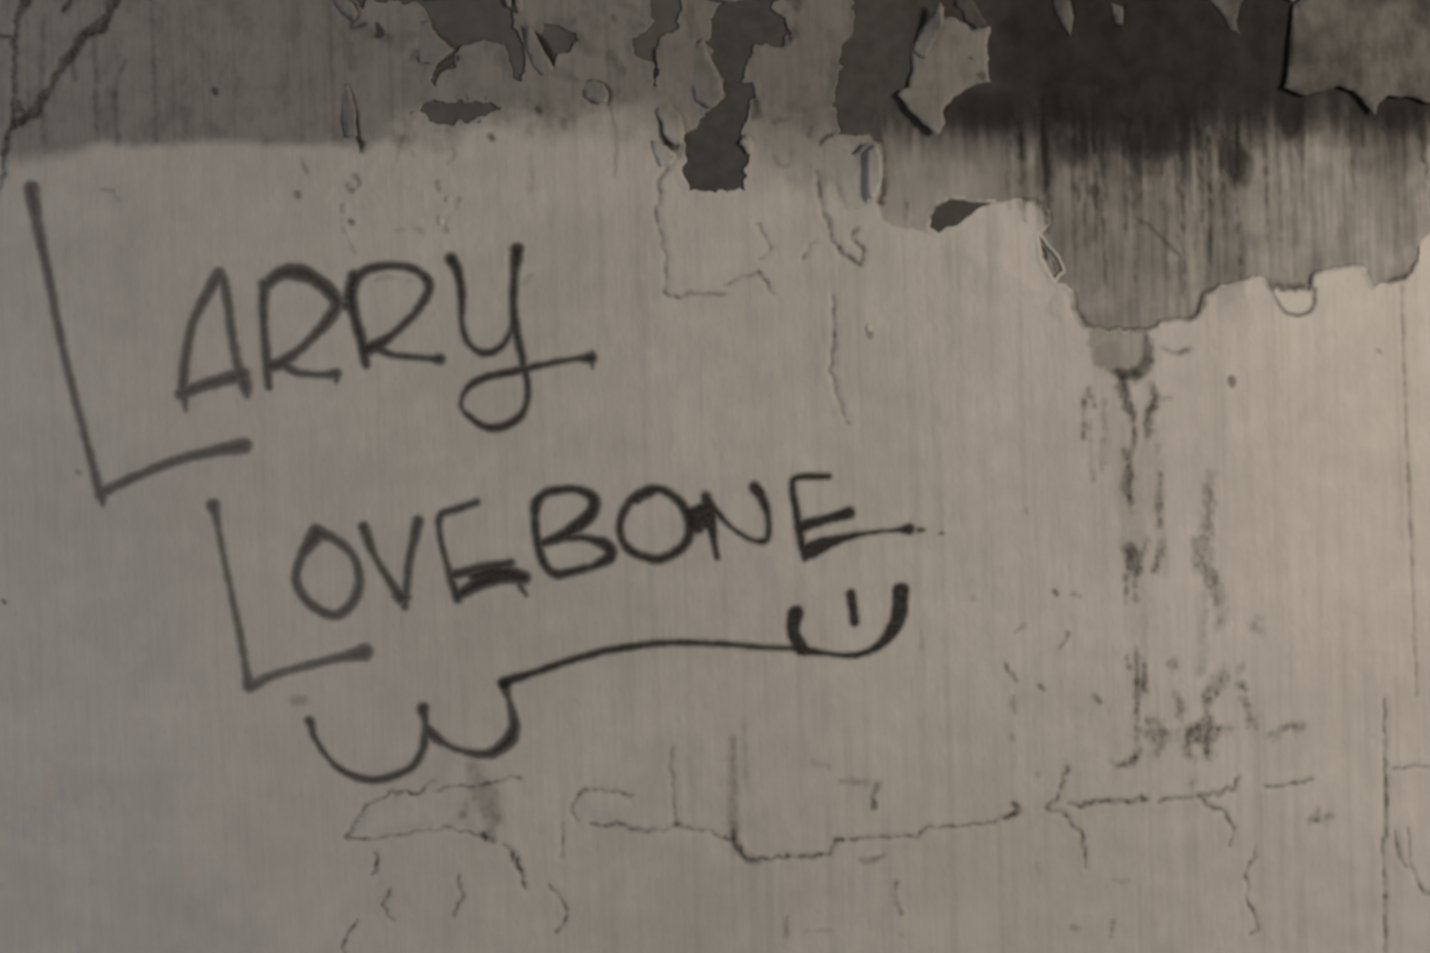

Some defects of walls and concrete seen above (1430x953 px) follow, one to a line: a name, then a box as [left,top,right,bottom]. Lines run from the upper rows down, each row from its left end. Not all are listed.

crack [63,0,119,65]
crack [2,90,46,156]
peeling [329,0,585,132]
peeling [625,0,799,201]
water stain [1001,0,1312,163]
water stain [1329,86,1430,122]
peeling [824,0,1430,336]
water stain [1227,147,1248,181]
water stain [1121,357,1156,420]
crack [732,836,844,860]